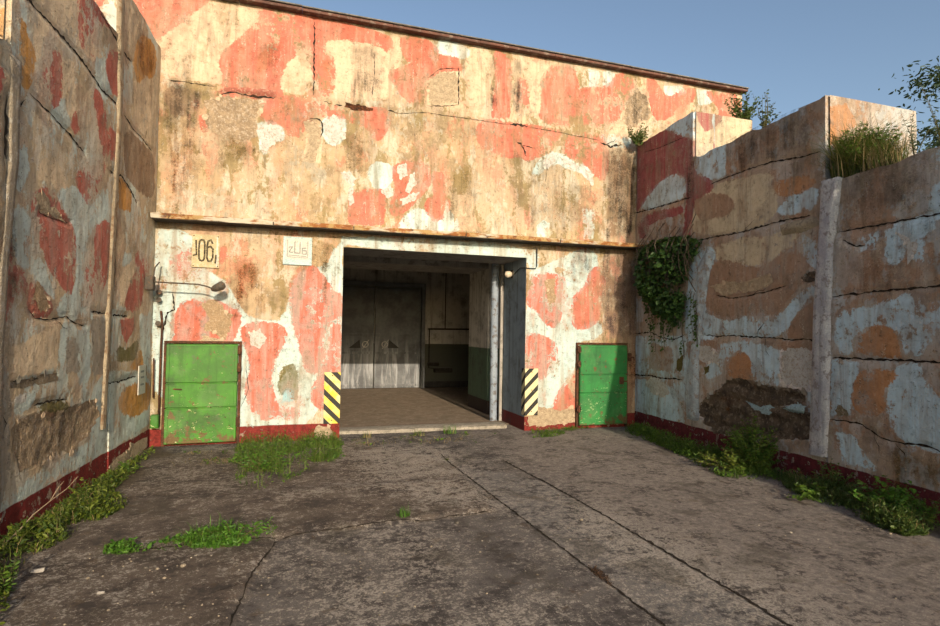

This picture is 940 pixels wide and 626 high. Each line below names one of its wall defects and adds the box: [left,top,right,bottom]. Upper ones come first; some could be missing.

spalling [426,72,459,106]
crack [372,61,620,182]
spalling [699,347,812,442]
spalling [11,398,100,473]
crack [831,419,940,455]